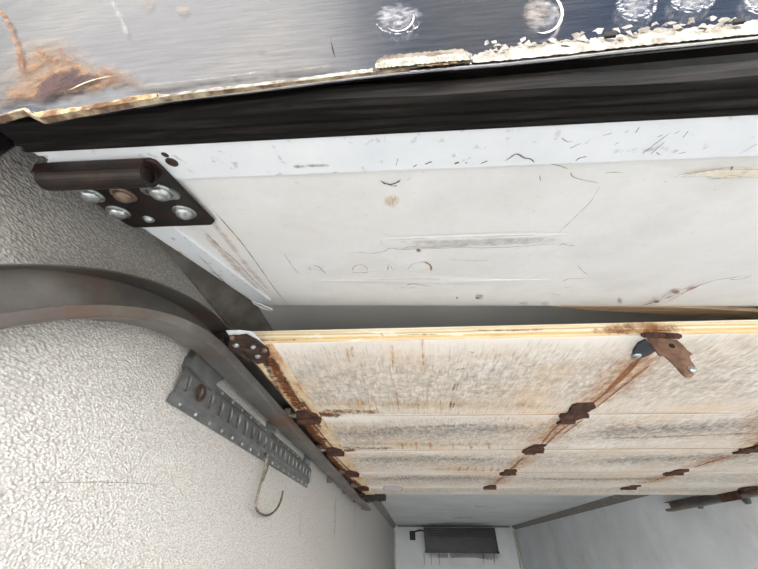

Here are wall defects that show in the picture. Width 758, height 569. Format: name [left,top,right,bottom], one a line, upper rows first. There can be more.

corrosion [0,9,131,102]
peeling [485,40,509,53]
peeling [518,31,590,46]
peeling [594,16,736,40]
corrosion [595,322,677,334]
corrosion [591,357,650,407]
corrosion [265,357,436,486]
corrosion [494,414,589,450]